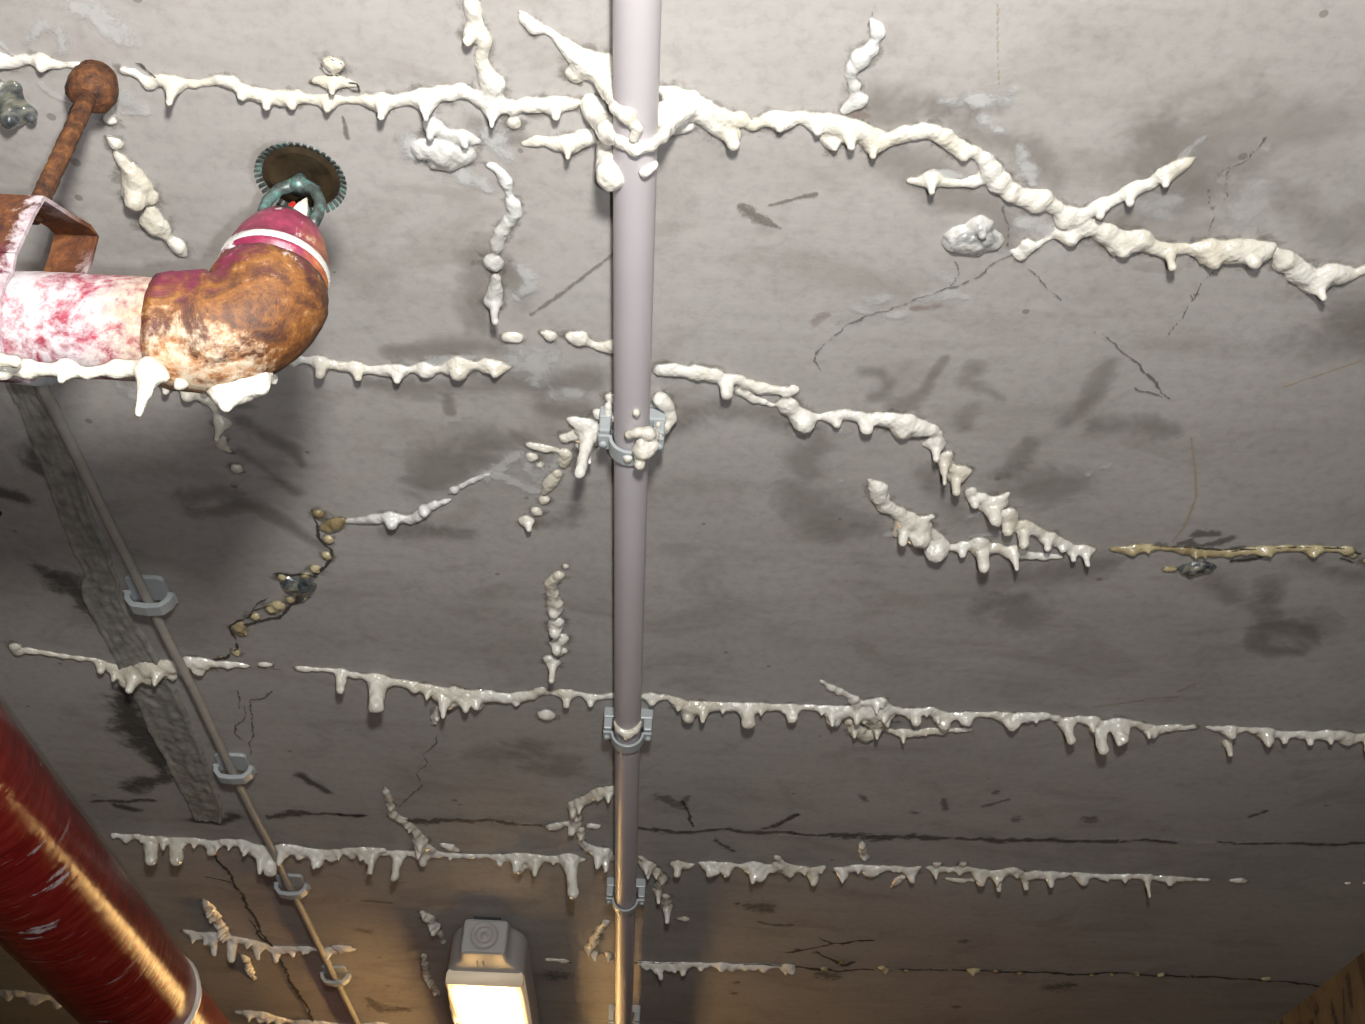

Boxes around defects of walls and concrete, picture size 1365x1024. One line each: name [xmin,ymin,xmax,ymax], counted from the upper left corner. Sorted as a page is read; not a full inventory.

crack [309,59,361,92]
damp [0,0,1365,487]
crack [213,510,334,755]
damp [110,786,615,899]
crack [266,735,543,826]
damp [295,564,614,725]
damp [274,392,678,581]
crack [638,801,1177,852]
damp [642,680,1365,757]
damp [653,361,1365,573]
crack [1167,546,1362,563]
crack [207,856,314,1022]